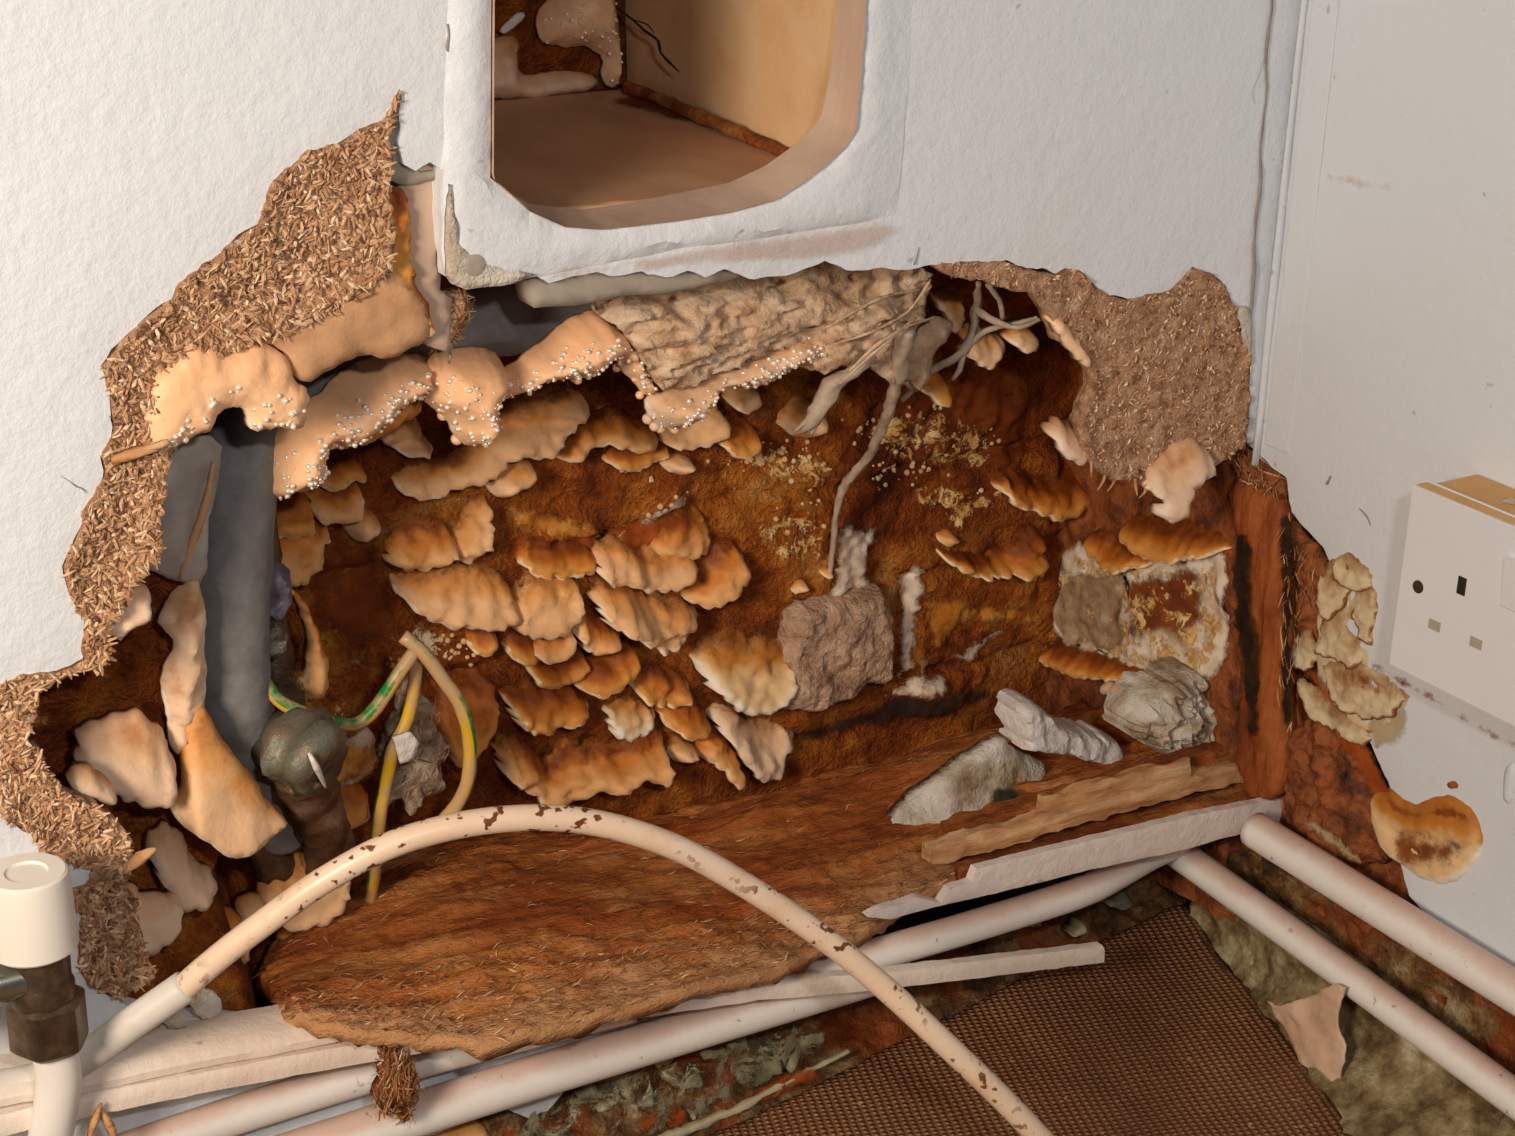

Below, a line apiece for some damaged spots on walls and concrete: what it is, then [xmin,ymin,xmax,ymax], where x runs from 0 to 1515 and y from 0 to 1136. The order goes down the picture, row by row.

flaking render [776,582,894,712]
flaking render [1053,574,1125,651]
damp [1369,707,1405,746]
damp [1309,823,1360,862]